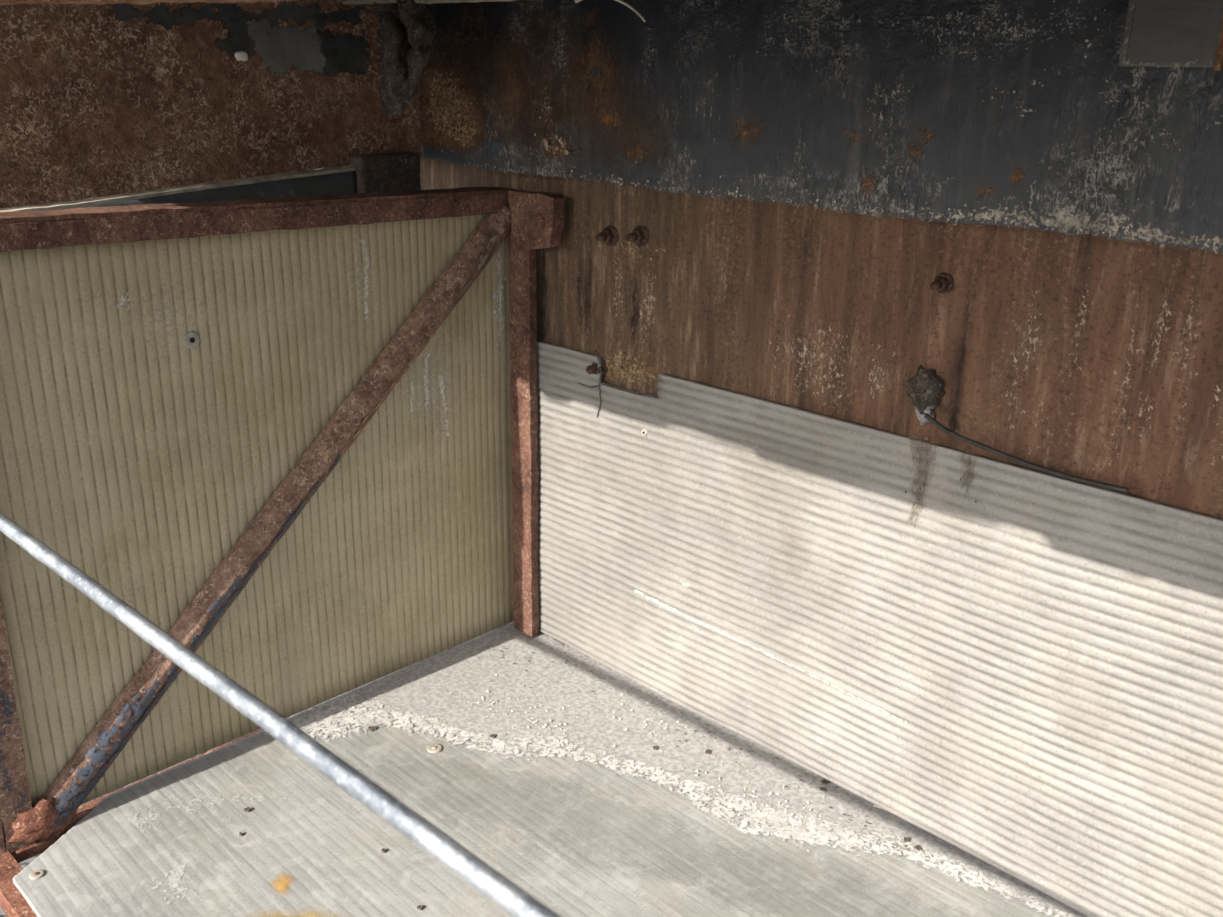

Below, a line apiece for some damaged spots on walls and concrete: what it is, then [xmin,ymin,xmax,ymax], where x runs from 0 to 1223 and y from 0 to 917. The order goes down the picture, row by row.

rust [419,61,485,154]
rust [518,128,584,182]
leakage [859,79,925,195]
leakage [878,0,1115,117]
leakage [964,80,1183,239]
rust [588,240,676,354]
rust [273,876,291,891]